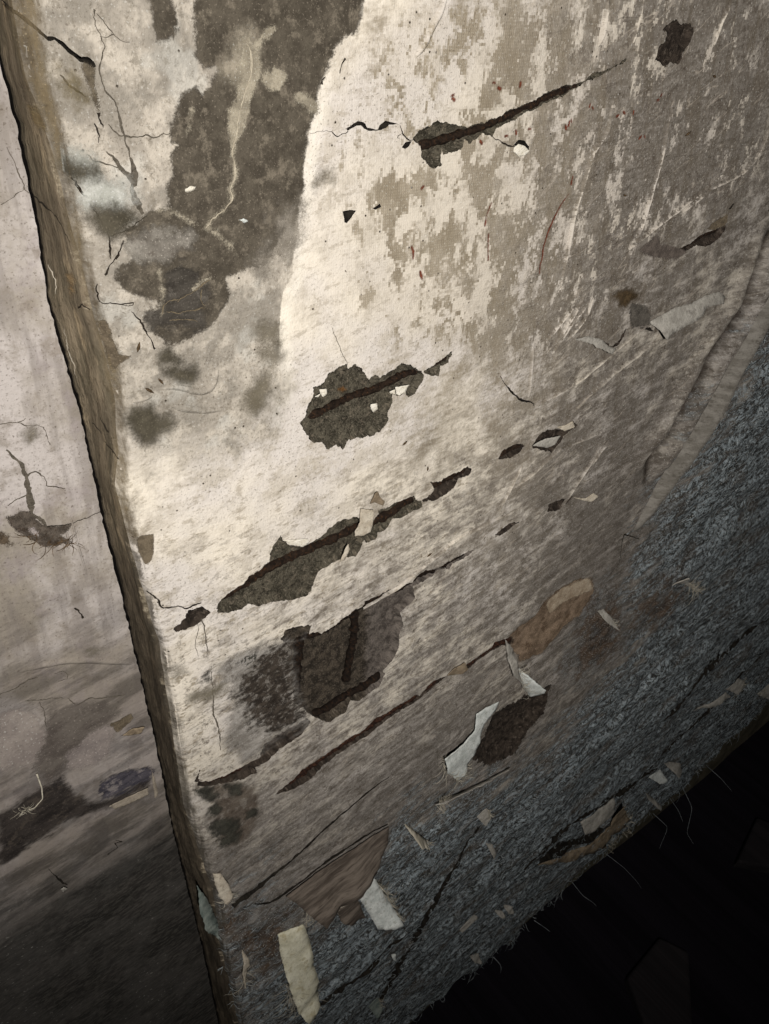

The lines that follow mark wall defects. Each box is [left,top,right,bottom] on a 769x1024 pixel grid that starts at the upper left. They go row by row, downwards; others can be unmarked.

spalling [655,19,694,67]
crack [1,0,170,350]
leakage [156,26,288,250]
leakage [294,92,319,115]
crack [310,121,414,149]
leakage [159,348,199,384]
leakage [241,374,270,414]
spalling [300,351,452,450]
crack [6,450,65,527]
spalling [174,467,472,632]
spalling [194,550,473,786]
flaking render [277,577,620,814]